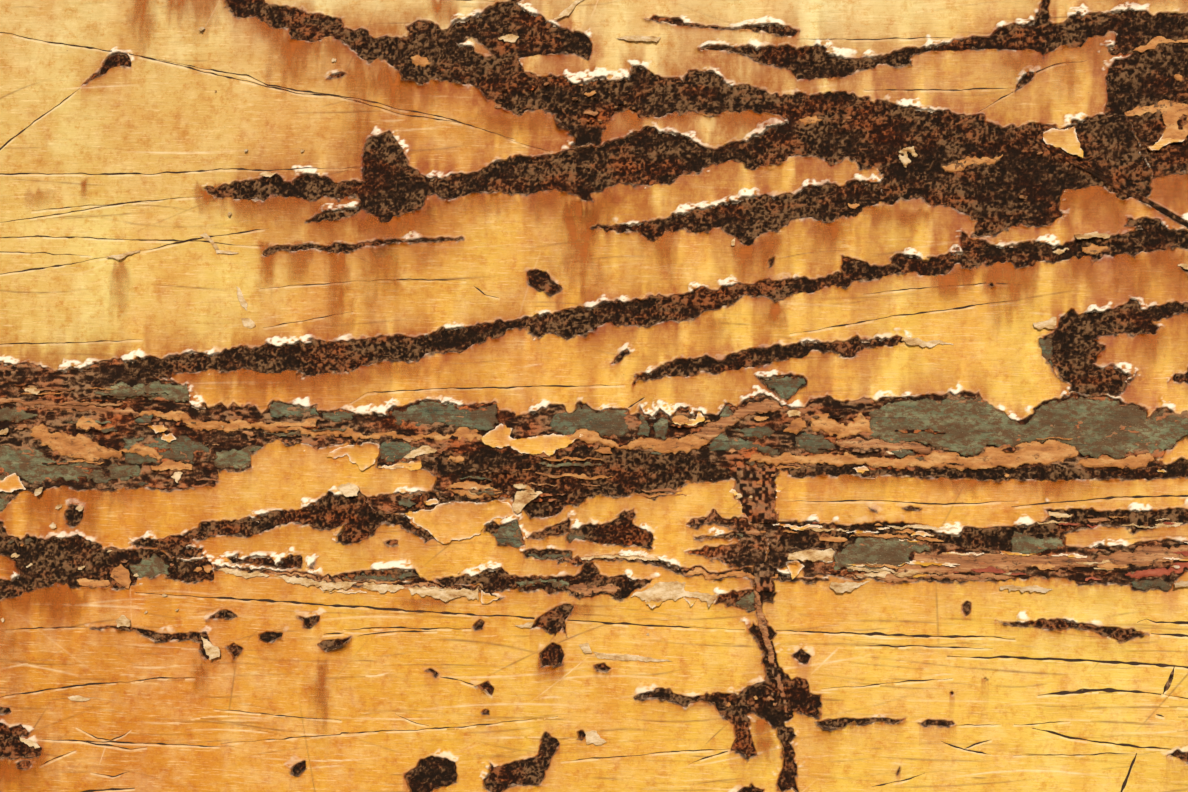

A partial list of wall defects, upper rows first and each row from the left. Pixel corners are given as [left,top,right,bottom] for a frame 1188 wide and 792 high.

peeling [85,55,131,84]
peeling [207,0,1188,245]
corrosion [702,0,1188,178]
corrosion [0,522,214,599]
corrosion [402,444,730,518]
peeling [0,217,1188,792]
corrosion [776,508,1188,552]
corrosion [788,458,1188,492]
crack [135,592,535,619]
crack [1137,619,1188,637]
crack [776,630,1188,717]
crack [1032,728,1168,792]